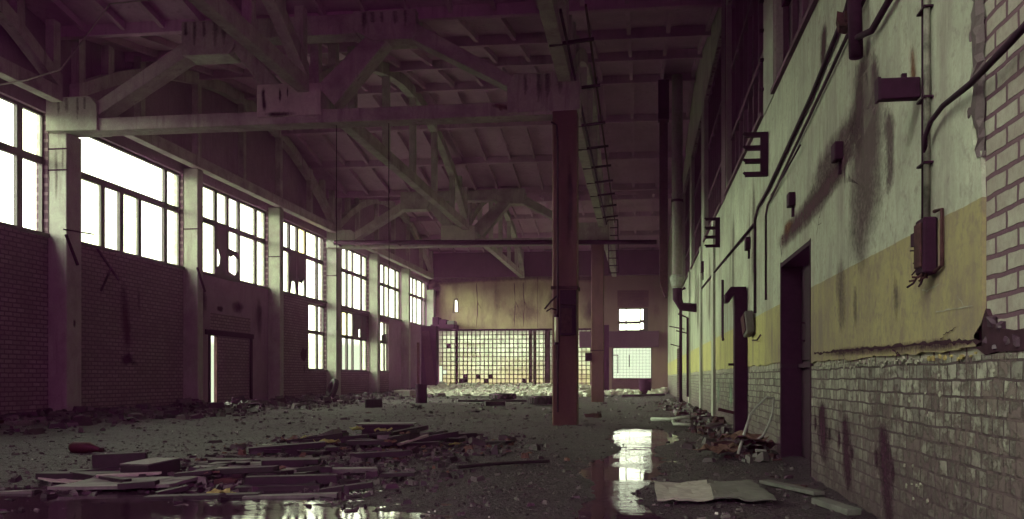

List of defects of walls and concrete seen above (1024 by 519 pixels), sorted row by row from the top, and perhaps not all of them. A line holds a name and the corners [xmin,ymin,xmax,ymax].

flaking render [967,0,985,158]
water stain [780,58,877,256]
water stain [885,114,893,186]
spalling [818,309,1024,410]
water stain [814,404,853,489]
water stain [874,427,895,519]